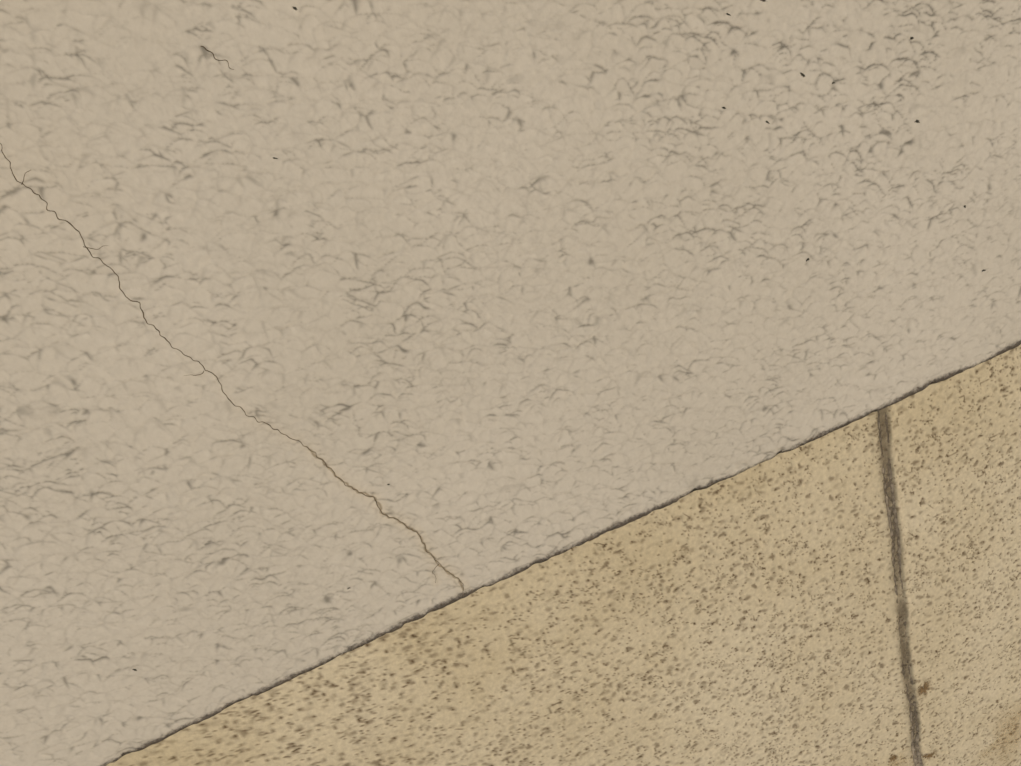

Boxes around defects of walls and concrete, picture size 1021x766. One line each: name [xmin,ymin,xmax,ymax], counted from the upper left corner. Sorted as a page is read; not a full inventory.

crack [0,143,464,589]